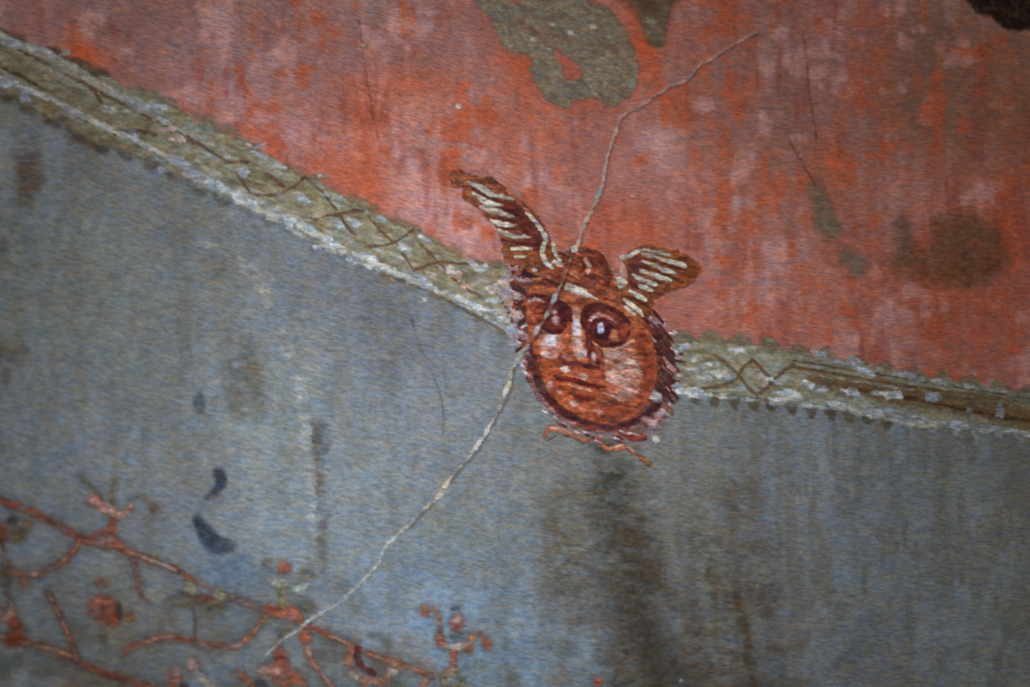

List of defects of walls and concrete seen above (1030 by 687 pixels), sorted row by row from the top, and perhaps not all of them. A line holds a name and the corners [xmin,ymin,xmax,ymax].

peeling [476,0,639,108]
peeling [631,0,673,47]
crack [266,31,758,656]